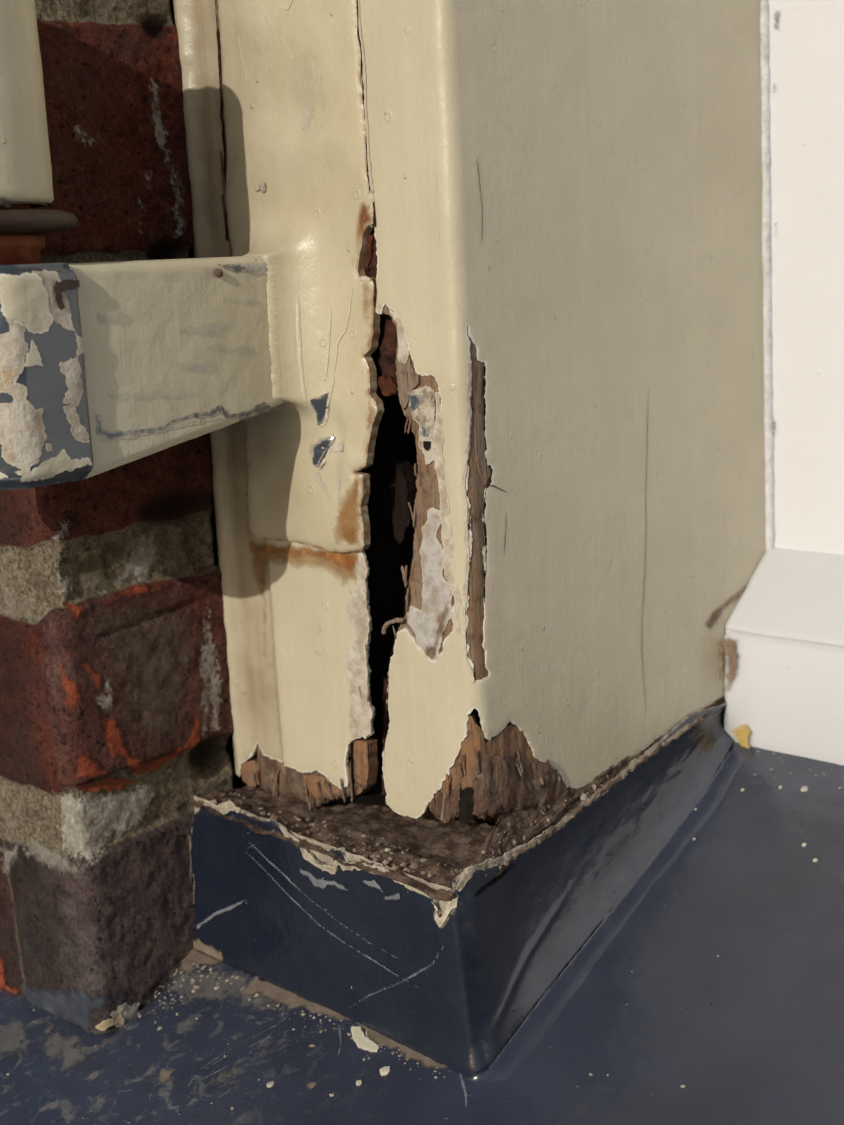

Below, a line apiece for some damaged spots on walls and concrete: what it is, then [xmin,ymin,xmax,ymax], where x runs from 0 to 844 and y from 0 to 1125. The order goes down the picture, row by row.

crack [356,0,376,227]
peeling [0,269,287,482]
spalling [296,288,353,486]
spalling [350,314,418,805]
spalling [432,897,458,927]